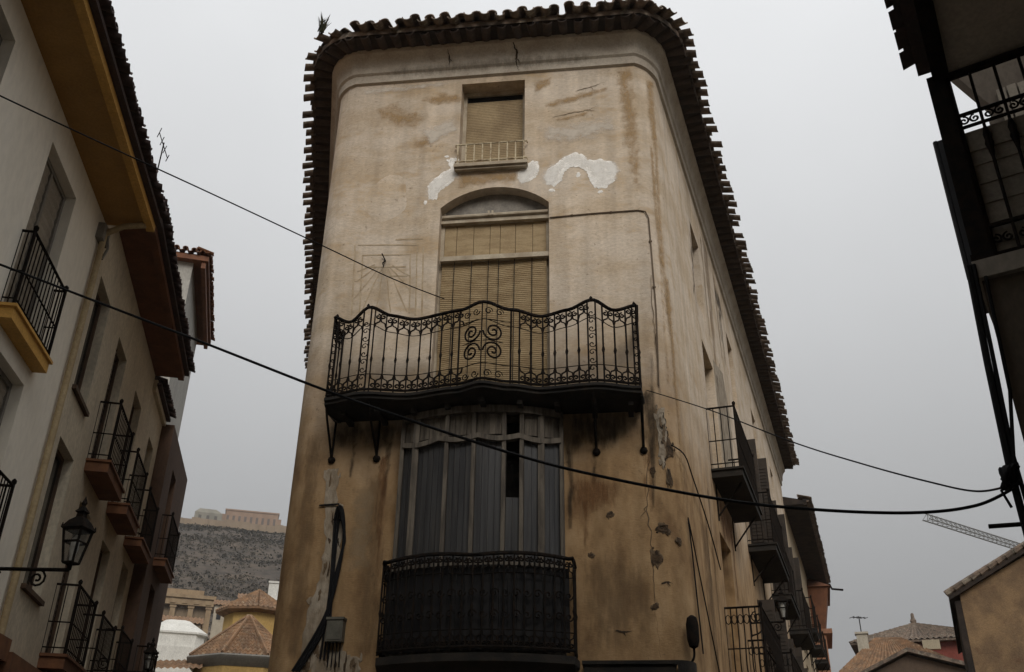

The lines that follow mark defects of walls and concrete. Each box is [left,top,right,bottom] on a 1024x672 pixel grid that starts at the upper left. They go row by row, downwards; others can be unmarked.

peeling [649,404,675,488]
peeling [300,468,362,672]
spalling [650,547,663,569]
spalling [655,522,682,547]